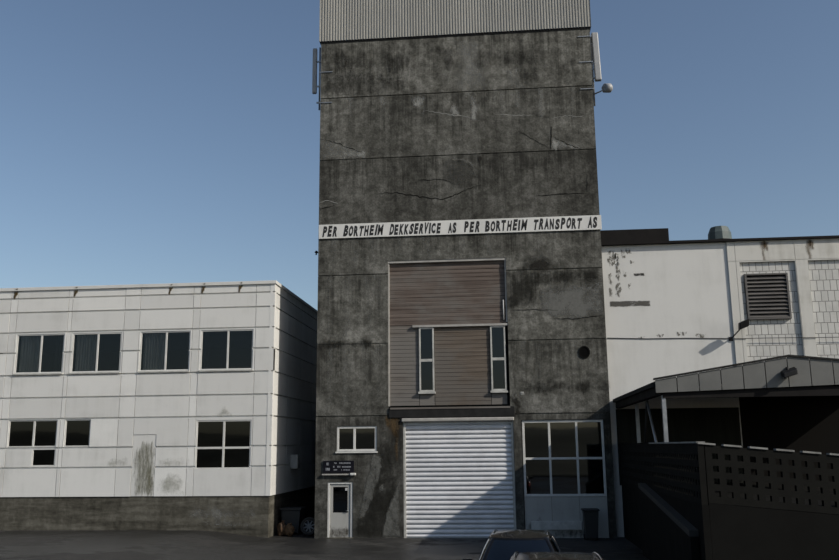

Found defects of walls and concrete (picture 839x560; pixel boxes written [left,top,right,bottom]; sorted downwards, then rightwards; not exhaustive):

crack [496,114,588,149]
crack [382,179,473,200]
peeling [607,250,650,307]